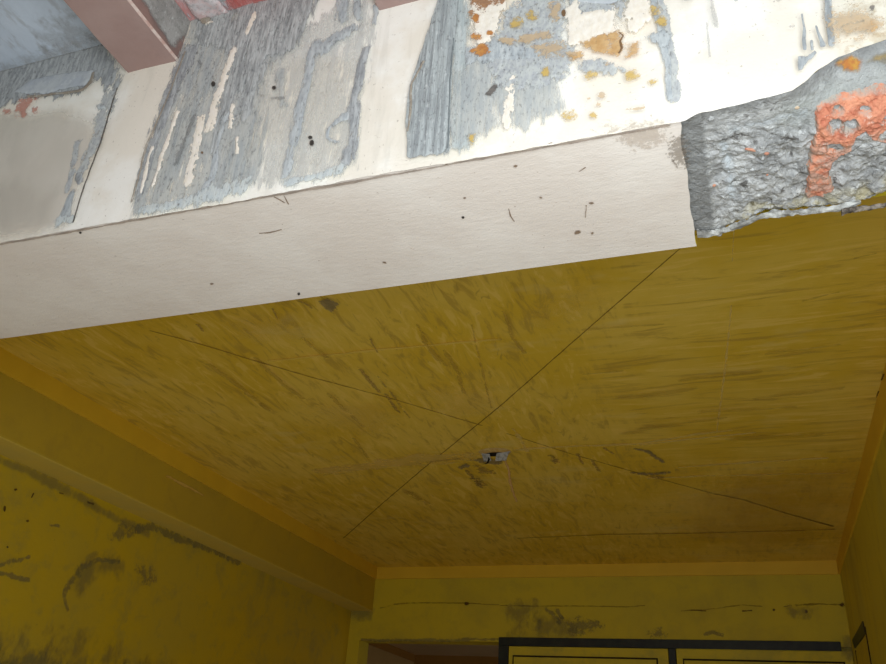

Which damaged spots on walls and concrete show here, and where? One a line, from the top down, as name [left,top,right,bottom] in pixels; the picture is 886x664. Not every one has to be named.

flaking render [0,45,122,118]
flaking render [184,0,232,20]
peeling [449,0,652,145]
rust [468,0,639,76]
rust [650,5,667,26]
spalling [681,40,886,238]
crack [153,234,697,538]
crack [509,434,834,534]